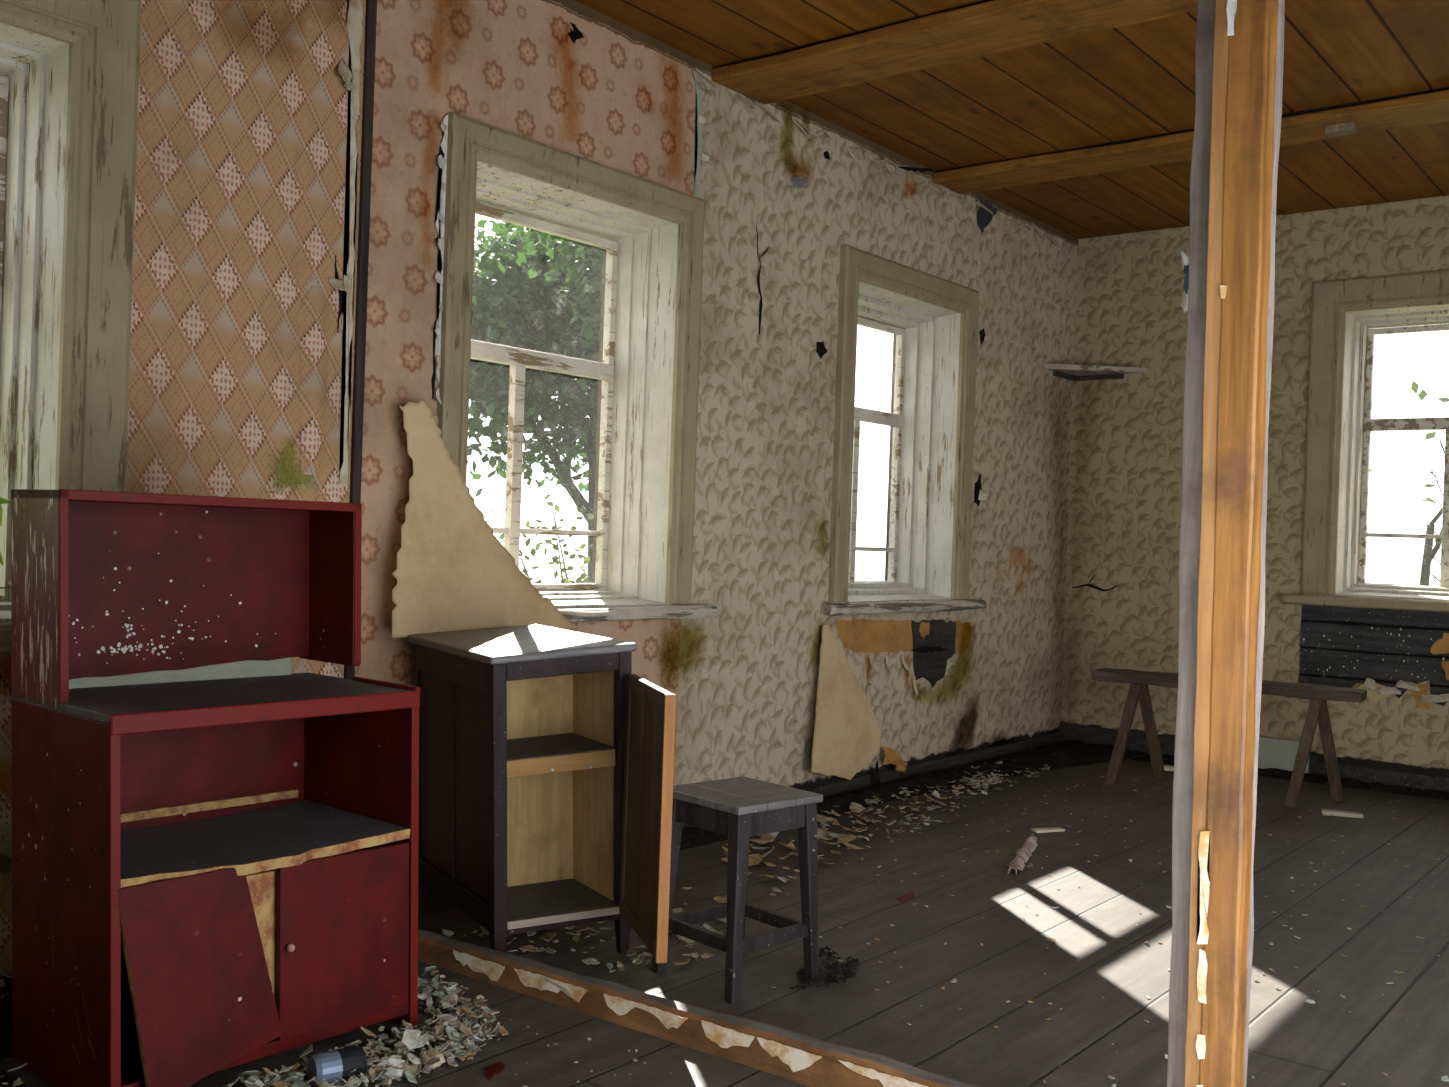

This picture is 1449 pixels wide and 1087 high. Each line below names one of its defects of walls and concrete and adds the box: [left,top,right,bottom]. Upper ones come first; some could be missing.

crack [756,221,769,335]
spalling [834,619,971,696]
peeling [1316,678,1449,778]